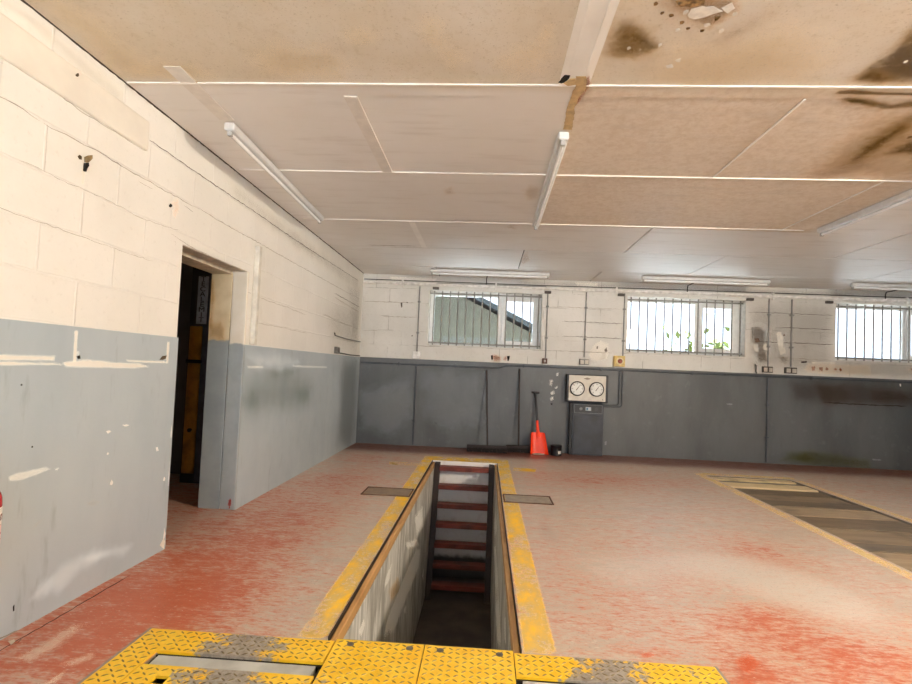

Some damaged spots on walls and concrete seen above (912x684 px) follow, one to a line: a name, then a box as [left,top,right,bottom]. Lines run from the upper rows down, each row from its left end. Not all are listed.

spalling [653,0,745,33]
leakage [600,3,842,86]
leakage [794,26,912,182]